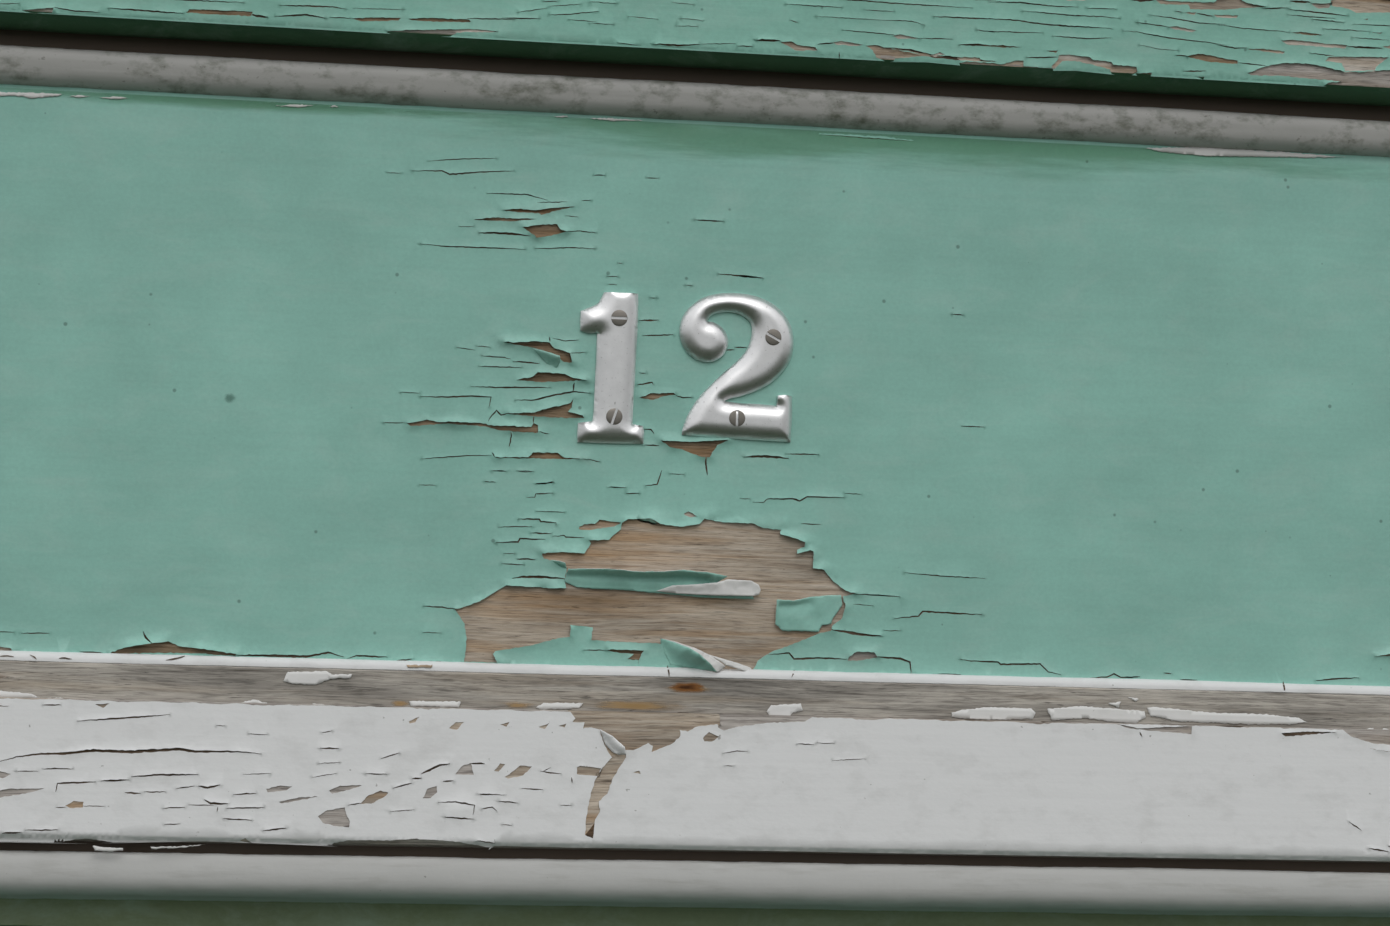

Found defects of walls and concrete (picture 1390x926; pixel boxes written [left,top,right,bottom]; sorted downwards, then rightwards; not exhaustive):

peeling [757,34,1150,74]
peeling [1176,0,1390,88]
crack [423,158,621,285]
crack [688,274,762,286]
crack [639,319,673,336]
crack [403,346,586,421]
crack [611,429,685,494]
crack [746,452,819,460]
peeling [454,512,911,672]
peeling [952,697,1390,752]
peeling [536,702,815,838]
peeling [266,785,473,845]